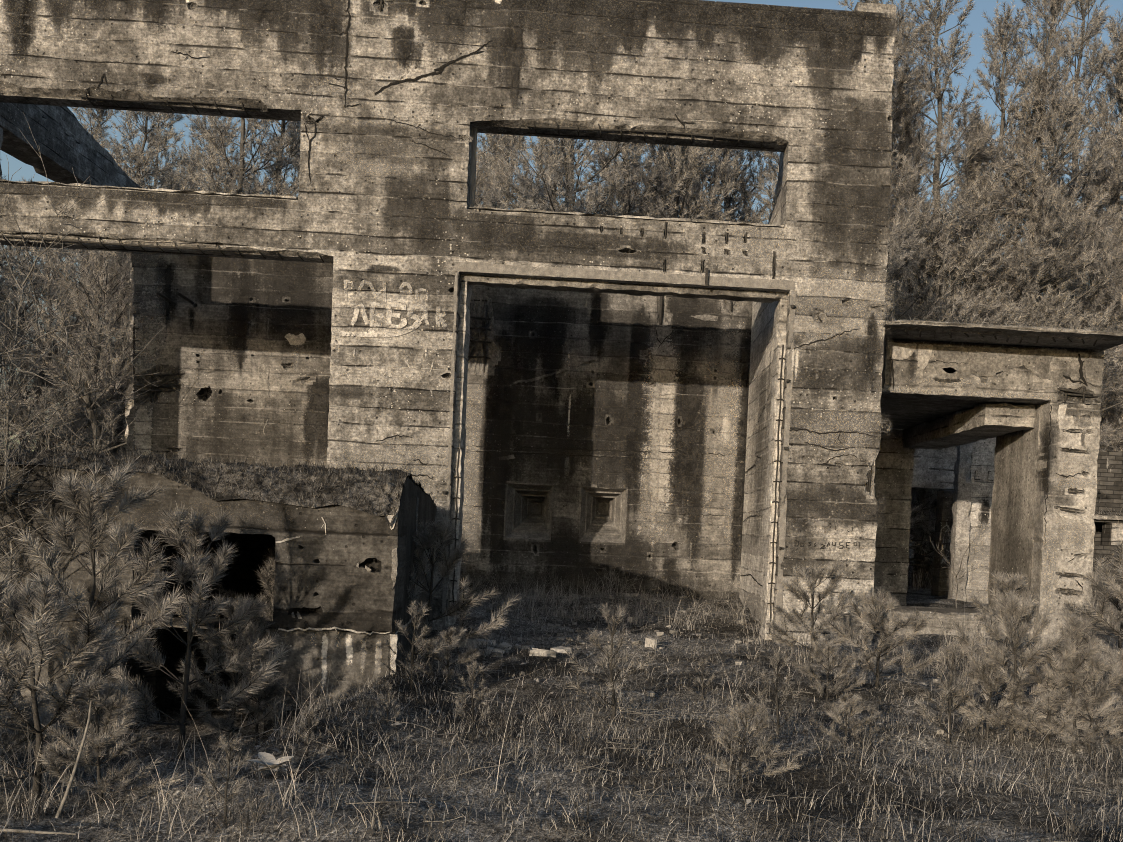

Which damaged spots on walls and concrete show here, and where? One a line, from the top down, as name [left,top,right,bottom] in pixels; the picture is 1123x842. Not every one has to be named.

damp [3,0,111,53]
crack [304,0,492,182]
damp [205,0,895,274]
damp [0,183,285,215]
damp [133,406,153,456]
damp [135,261,195,371]
damp [184,373,330,468]
damp [197,256,333,366]
damp [478,292,752,583]
crack [1044,405,1081,543]
crack [1063,354,1088,386]
damp [346,635,381,674]